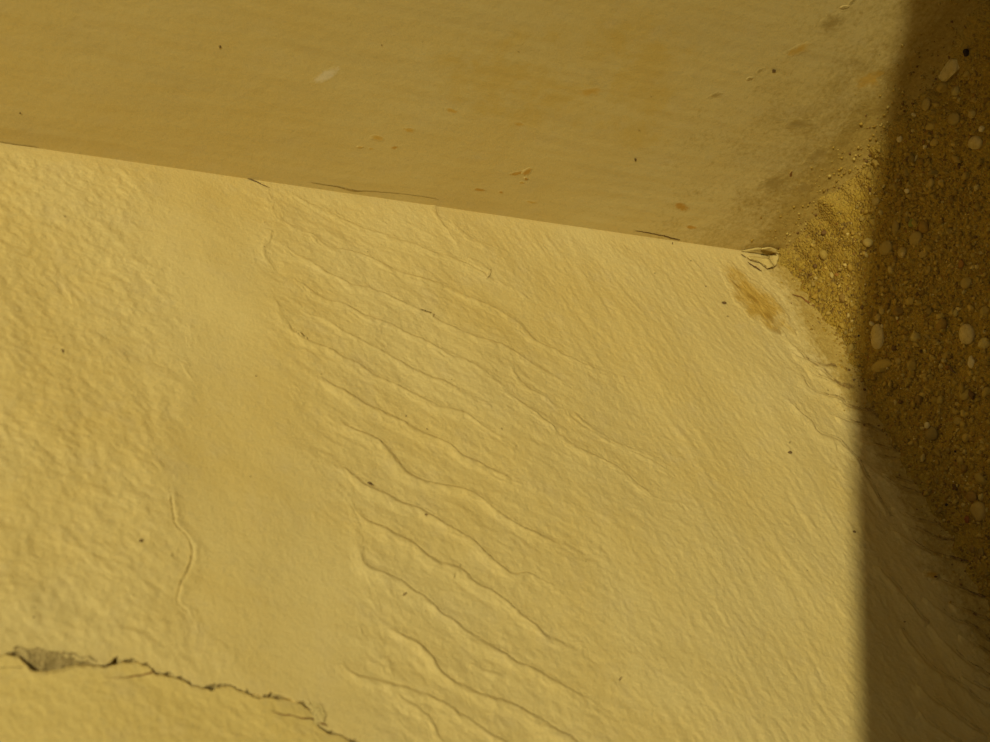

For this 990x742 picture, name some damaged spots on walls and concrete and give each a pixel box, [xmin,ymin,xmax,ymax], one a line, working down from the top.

crack [108,661,153,678]
crack [252,694,327,726]